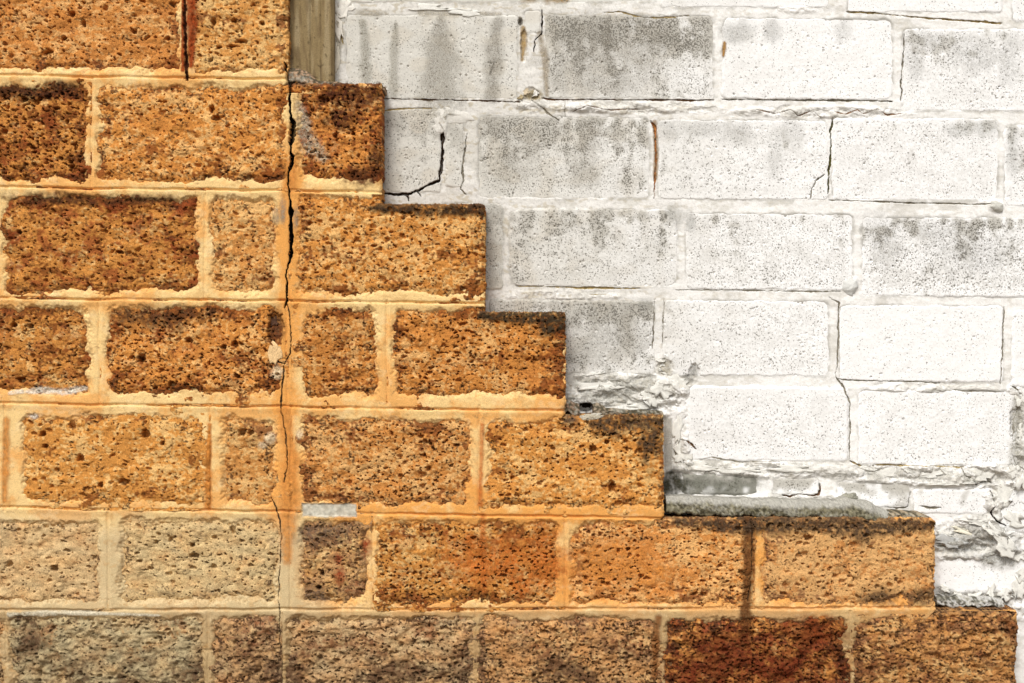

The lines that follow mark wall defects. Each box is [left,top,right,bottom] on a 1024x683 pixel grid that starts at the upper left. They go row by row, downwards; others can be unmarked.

crack [182,0,190,79]
corrosion [181,0,198,72]
crack [385,11,1001,205]
crack [266,62,296,658]
peeling [564,359,696,424]
peeling [859,394,1024,602]